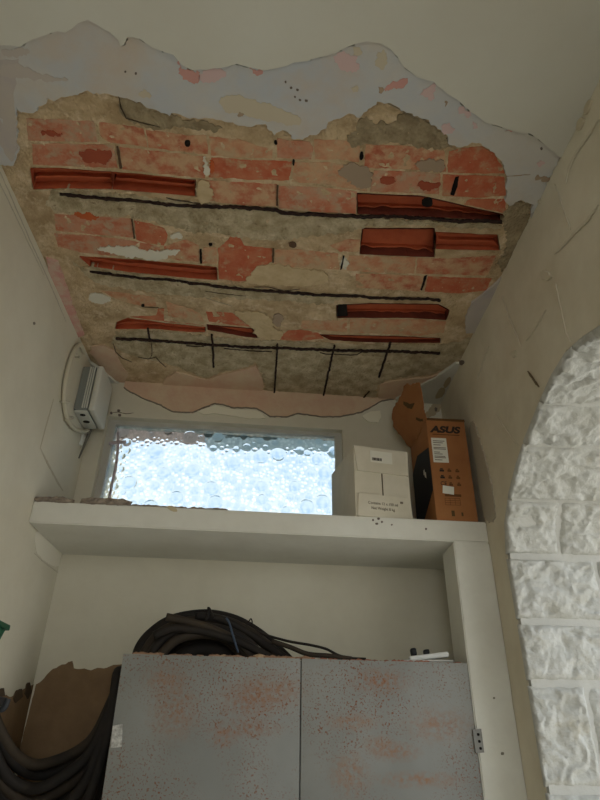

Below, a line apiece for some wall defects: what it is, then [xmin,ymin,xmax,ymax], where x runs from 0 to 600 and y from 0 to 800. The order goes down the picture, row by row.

peeling [0,20,560,390]
flaking render [198,406,266,419]
peeling [0,661,122,759]